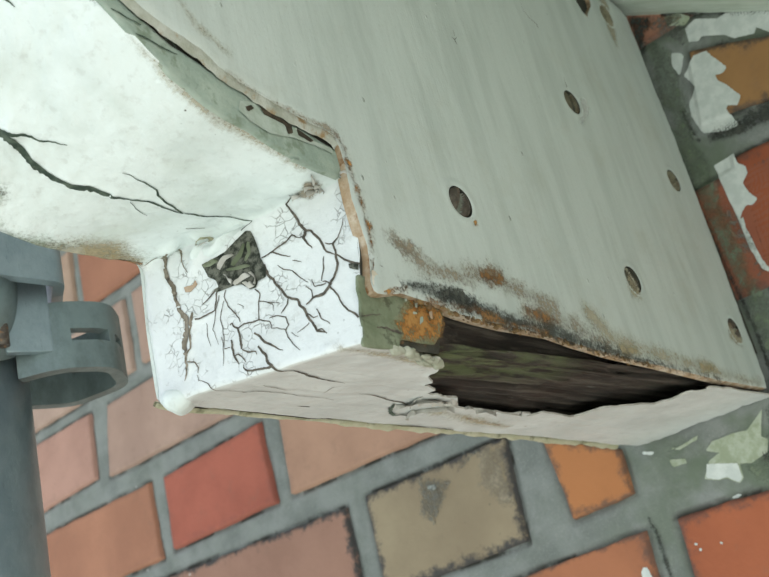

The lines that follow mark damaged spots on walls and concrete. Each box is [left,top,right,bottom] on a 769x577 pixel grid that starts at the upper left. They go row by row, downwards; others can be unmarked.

peeling [665,11,769,42]
peeling [239,101,333,153]
peeling [671,51,740,133]
crack [0,129,252,231]
peeling [291,175,324,201]
peeling [714,154,769,271]
peeling [202,231,266,292]
crack [144,195,402,400]
corrosion [384,237,655,368]
peeling [389,345,444,370]
peeling [388,397,497,421]
peeling [705,410,768,483]